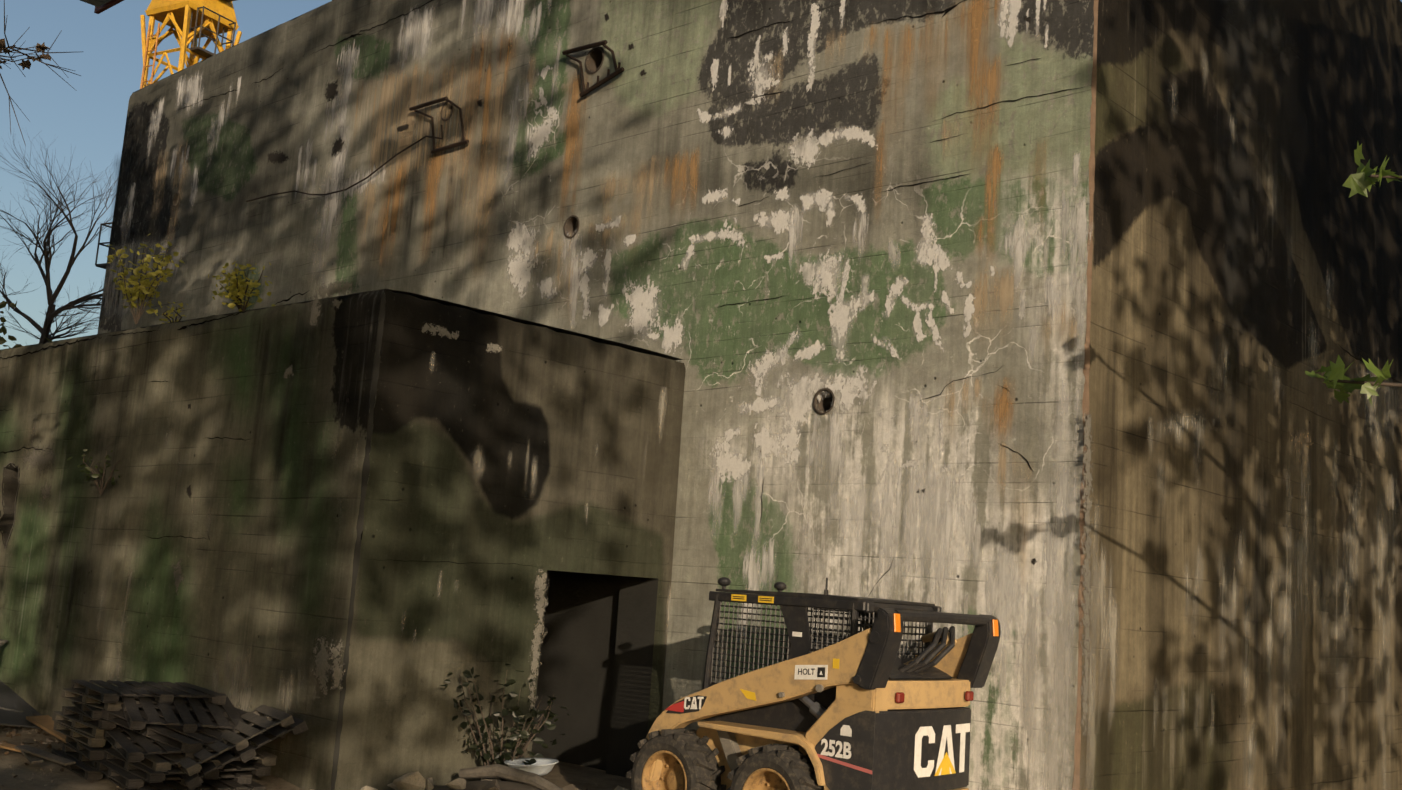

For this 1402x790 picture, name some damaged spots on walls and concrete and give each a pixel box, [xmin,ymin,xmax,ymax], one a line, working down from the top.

crack [868,0,966,25]
rust [371,35,492,249]
damp [562,234,582,309]
damp [789,205,803,256]
damp [853,214,868,244]
spalling [0,462,20,549]
damp [1221,473,1308,673]
damp [1335,490,1357,656]
spalling [527,569,550,710]